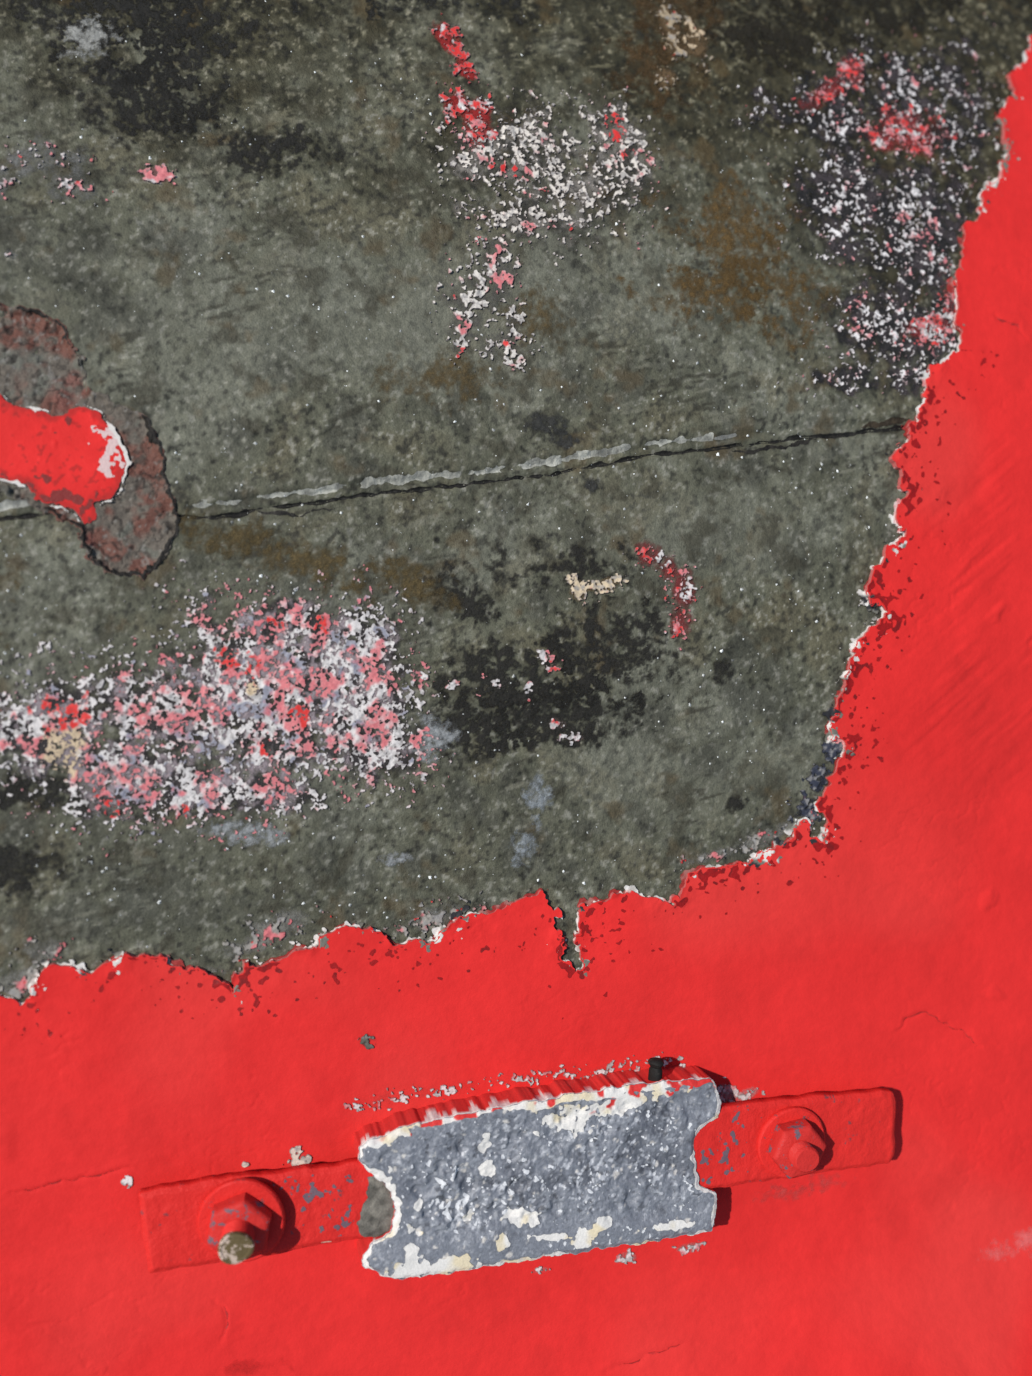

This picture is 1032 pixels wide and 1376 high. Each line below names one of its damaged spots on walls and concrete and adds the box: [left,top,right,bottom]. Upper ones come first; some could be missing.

crack [0,499,51,521]
peeling [0,0,1032,1037]
crack [179,417,910,520]
peeling [343,1052,765,1279]